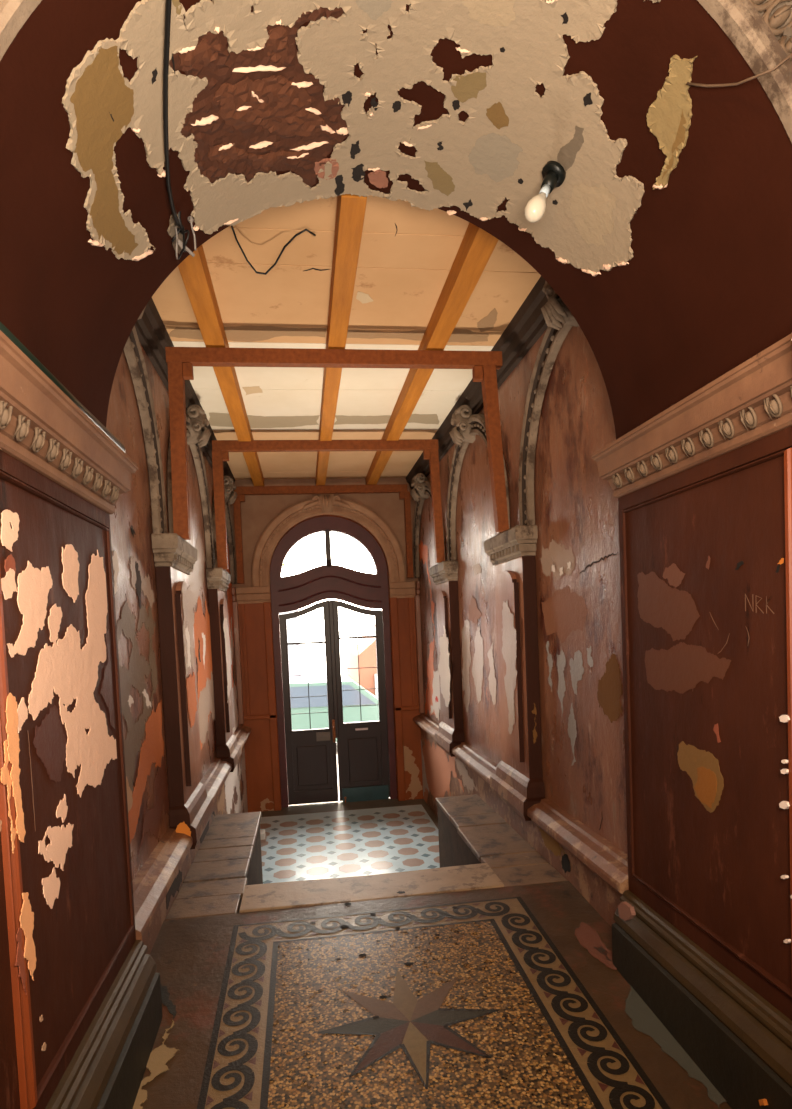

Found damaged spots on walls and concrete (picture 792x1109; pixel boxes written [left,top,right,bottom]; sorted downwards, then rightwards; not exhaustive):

spalling [169,7,388,196]
spalling [167,215,199,254]
peeling [581,261,629,277]
peeling [182,532,215,750]
peeling [223,544,238,734]
peeling [637,563,731,694]
flaking render [0,509,164,909]
peeling [677,723,724,813]
flaking render [15,892,36,995]